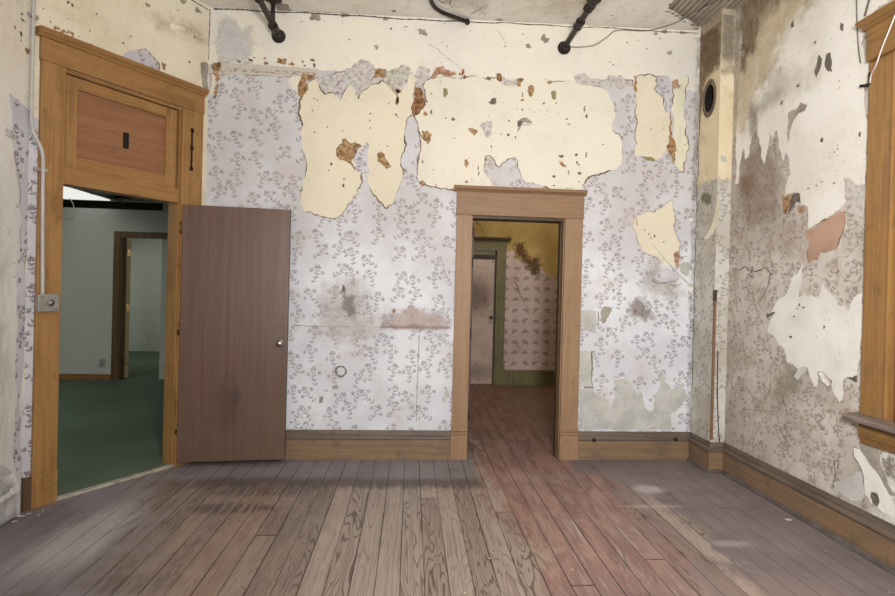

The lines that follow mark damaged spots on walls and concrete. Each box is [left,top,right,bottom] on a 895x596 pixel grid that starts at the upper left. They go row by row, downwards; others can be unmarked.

rust [412,85,426,116]
peeling [768,265,863,402]
flaking render [578,350,685,431]
spalling [834,442,895,517]